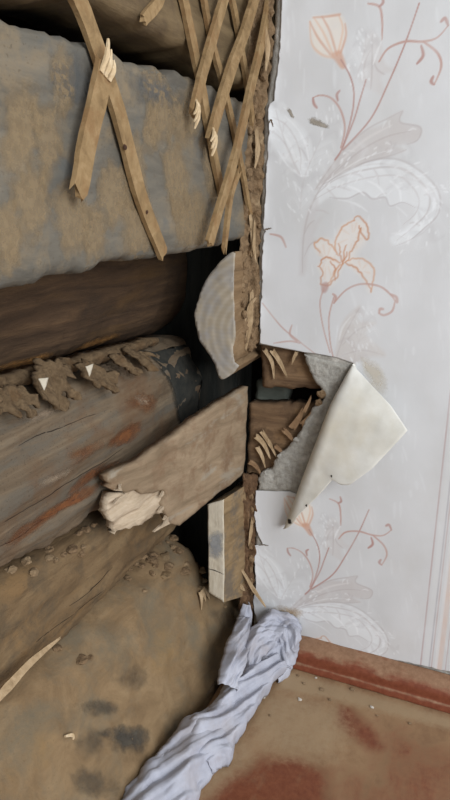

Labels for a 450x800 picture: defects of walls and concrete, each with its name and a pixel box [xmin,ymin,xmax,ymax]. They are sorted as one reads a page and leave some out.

crack [1,448,123,546]
flaking render [238,354,350,616]